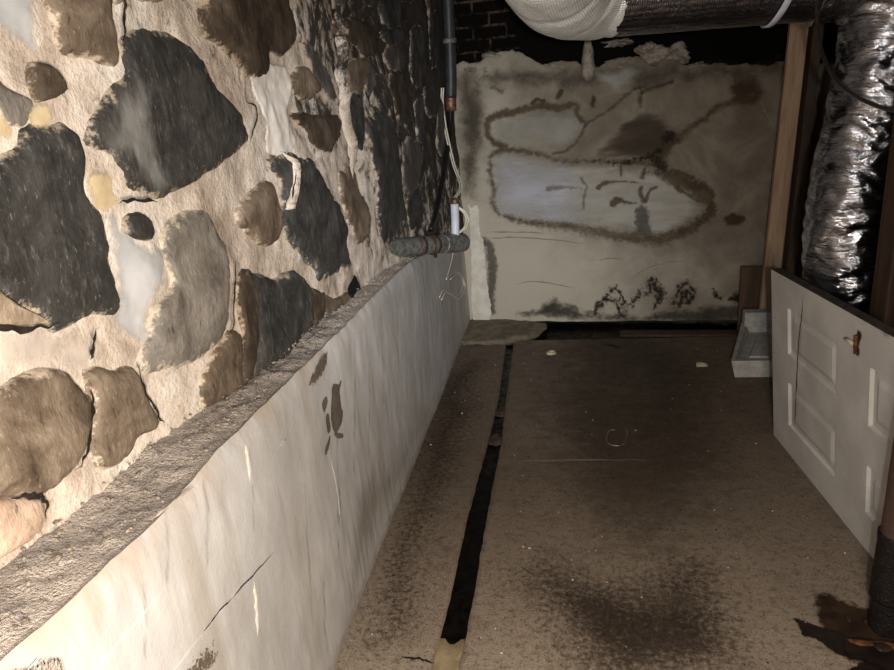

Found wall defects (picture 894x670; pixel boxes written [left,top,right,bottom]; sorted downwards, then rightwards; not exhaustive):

leakage [462,69,761,245]
leakage [525,277,739,323]
peeling [309,354,327,386]
spalling [17,658,64,670]
crack [203,559,268,633]
leakage [527,565,722,670]
corrosion [794,592,894,670]